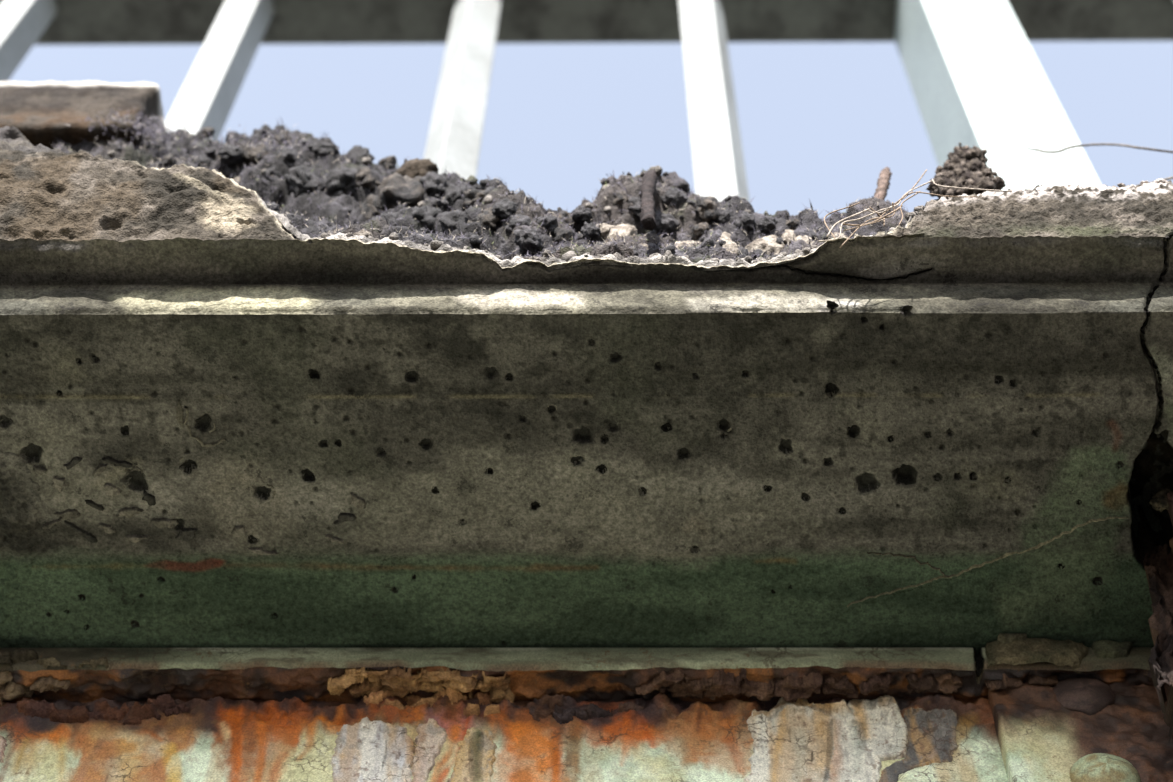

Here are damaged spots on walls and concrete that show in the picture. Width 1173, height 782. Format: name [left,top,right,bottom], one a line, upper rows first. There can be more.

spalling [57,116,949,271]
crack [769,265,932,281]
crack [1140,234,1173,436]
peeling [0,648,193,725]
corrosion [0,693,778,782]
peeling [327,666,515,782]
peeling [529,668,958,782]
corrosion [808,697,848,705]
corrosion [896,694,1002,765]